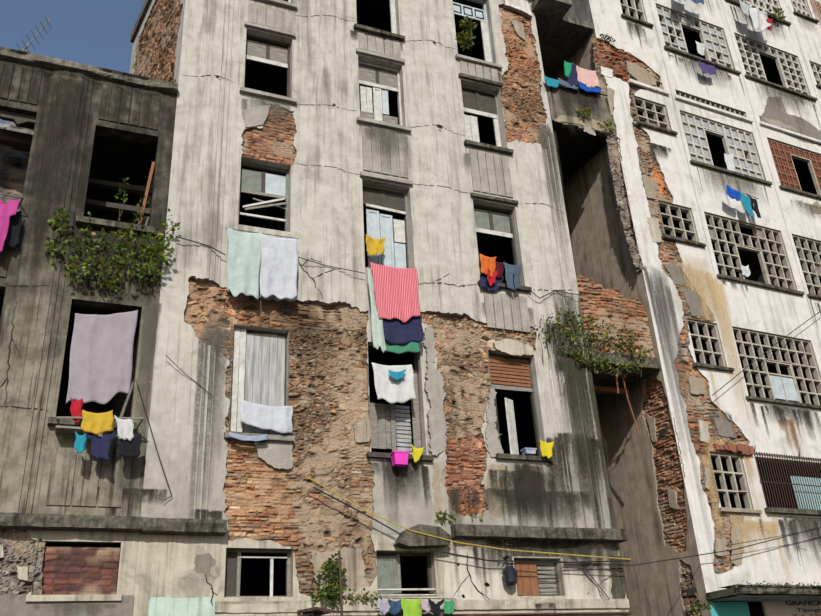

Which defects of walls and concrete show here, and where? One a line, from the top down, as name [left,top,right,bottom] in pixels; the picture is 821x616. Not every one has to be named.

spalling [134,0,183,83]
spalling [241,105,296,168]
spalling [499,0,750,574]
water stain [644,268,677,331]
spalling [184,279,376,596]
spalling [422,312,535,520]
water stain [750,402,817,425]
spalling [642,377,702,616]
spalling [0,530,45,596]
peeling [609,556,627,599]